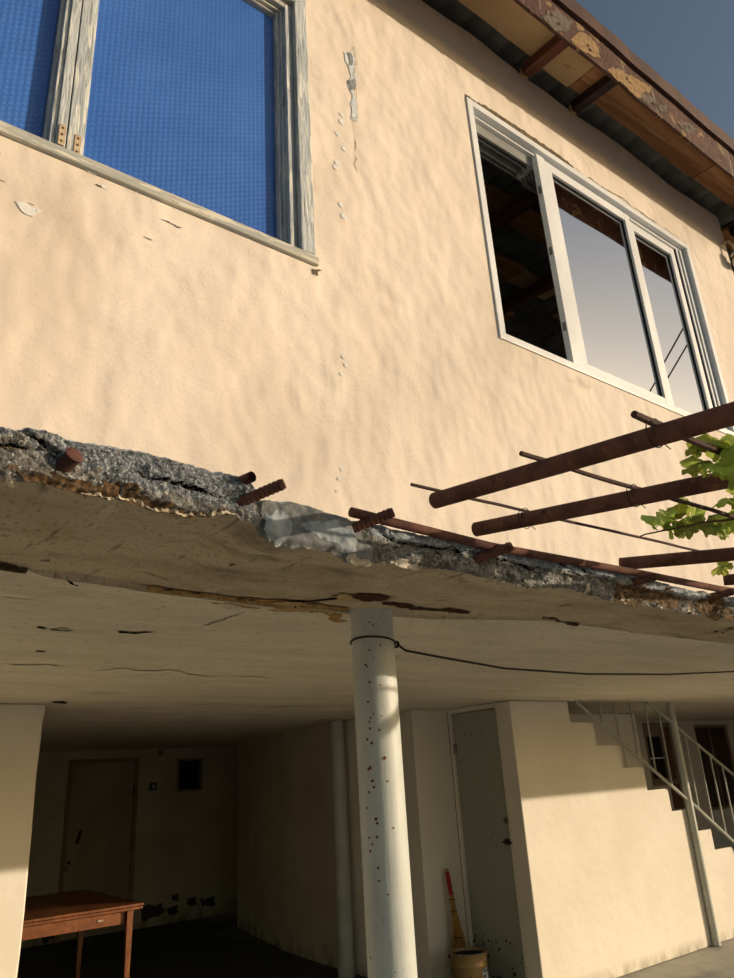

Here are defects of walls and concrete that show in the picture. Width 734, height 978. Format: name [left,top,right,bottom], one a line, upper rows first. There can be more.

spalling [8,465,249,520]
spalling [0,563,28,574]
peeling [141,893,216,922]